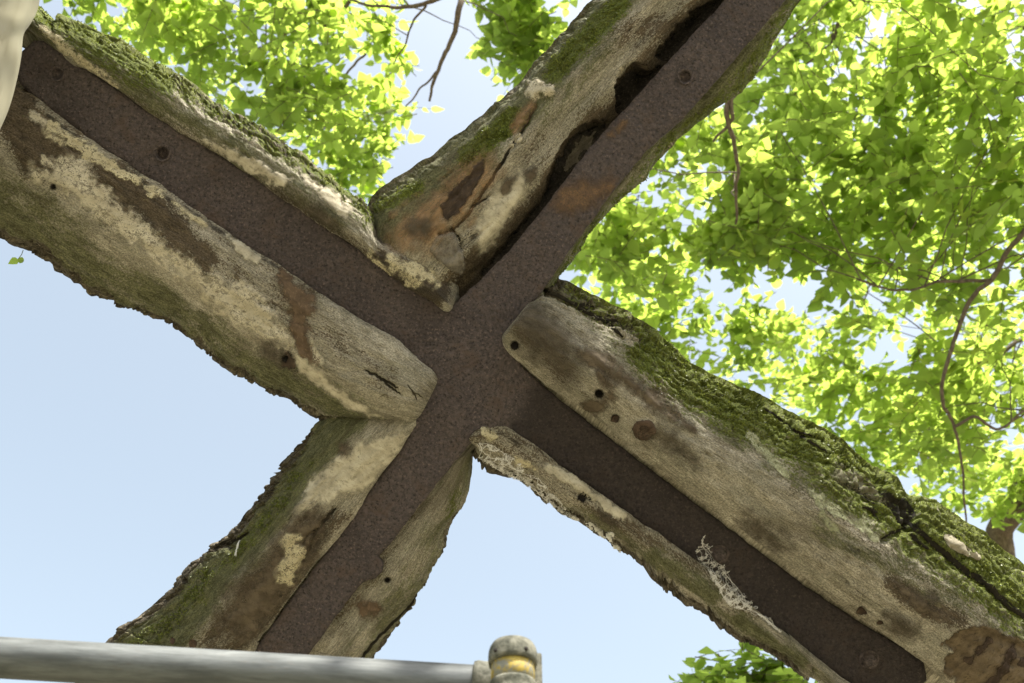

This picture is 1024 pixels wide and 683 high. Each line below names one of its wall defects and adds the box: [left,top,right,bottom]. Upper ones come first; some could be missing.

crack [444,105,536,249]
crack [365,370,422,400]
rust [632,420,657,441]
crack [843,483,1024,619]